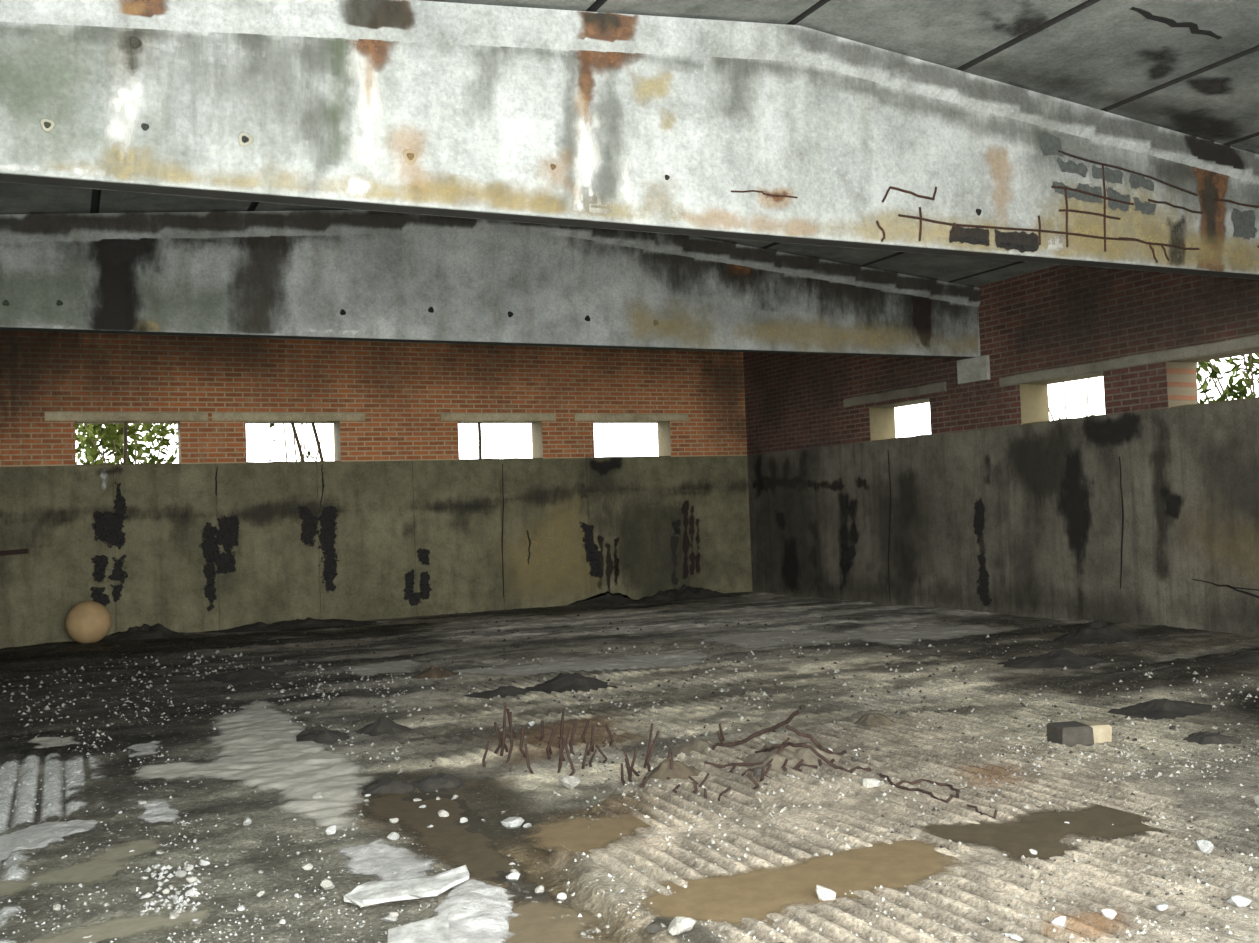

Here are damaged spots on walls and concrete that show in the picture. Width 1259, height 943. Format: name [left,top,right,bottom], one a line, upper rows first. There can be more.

damp [349,40,381,164]
corrosion [345,0,413,69]
corrosion [578,12,639,102]
damp [1142,50,1175,79]
crack [1130,7,1222,39]
damp [1188,78,1232,95]
damp [0,179,492,333]
spalling [882,133,1203,263]
corrosion [1193,166,1229,271]
damp [1084,413,1140,444]
damp [671,482,710,585]
damp [1151,423,1182,578]